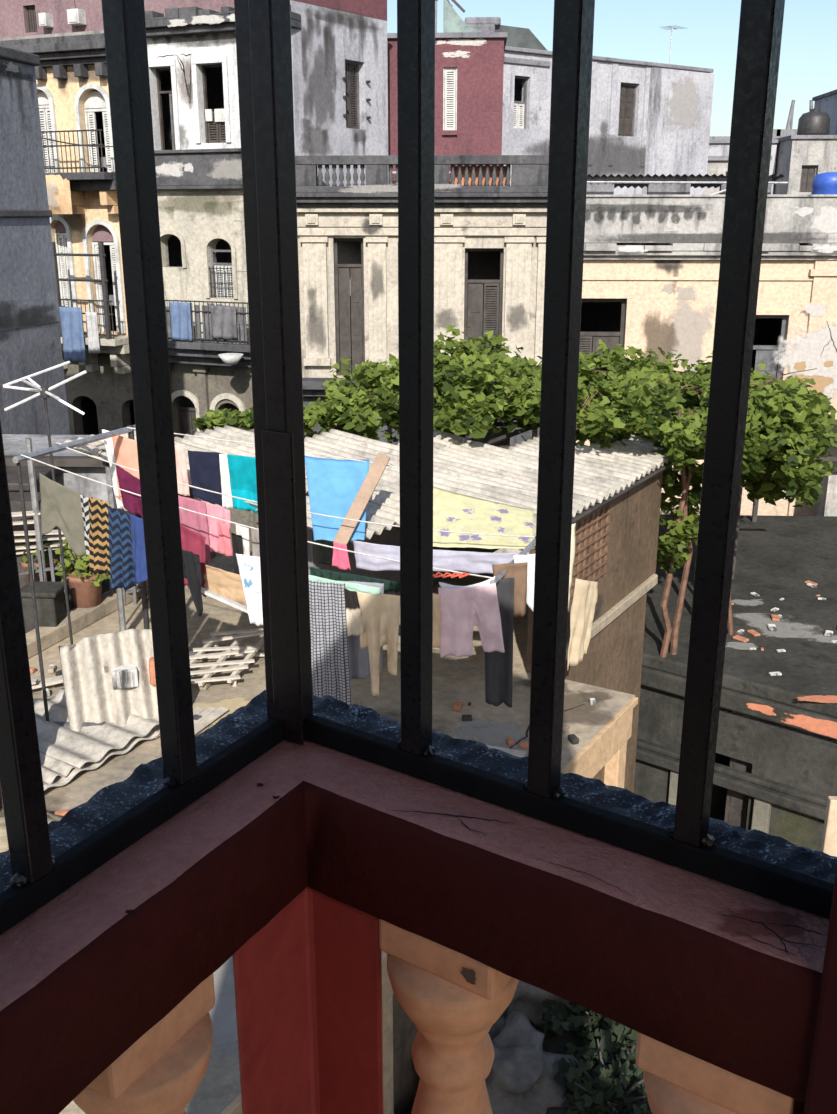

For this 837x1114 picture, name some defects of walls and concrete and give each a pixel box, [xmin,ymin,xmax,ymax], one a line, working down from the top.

peeling [168,14,235,27]
peeling [436,38,487,58]
peeling [156,163,193,177]
peeling [213,160,242,178]
water stain [656,260,682,270]
water stain [645,317,676,364]
peeling [775,303,837,401]
crack [392,810,515,834]
crack [721,914,827,957]
peeling [460,968,476,985]